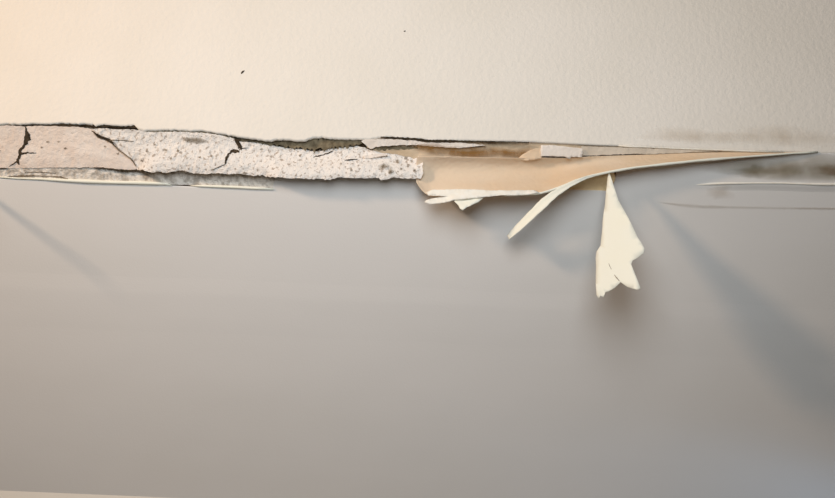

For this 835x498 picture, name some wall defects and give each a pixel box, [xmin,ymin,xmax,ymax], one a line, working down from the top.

crack [0,123,648,179]
spalling [0,125,818,298]